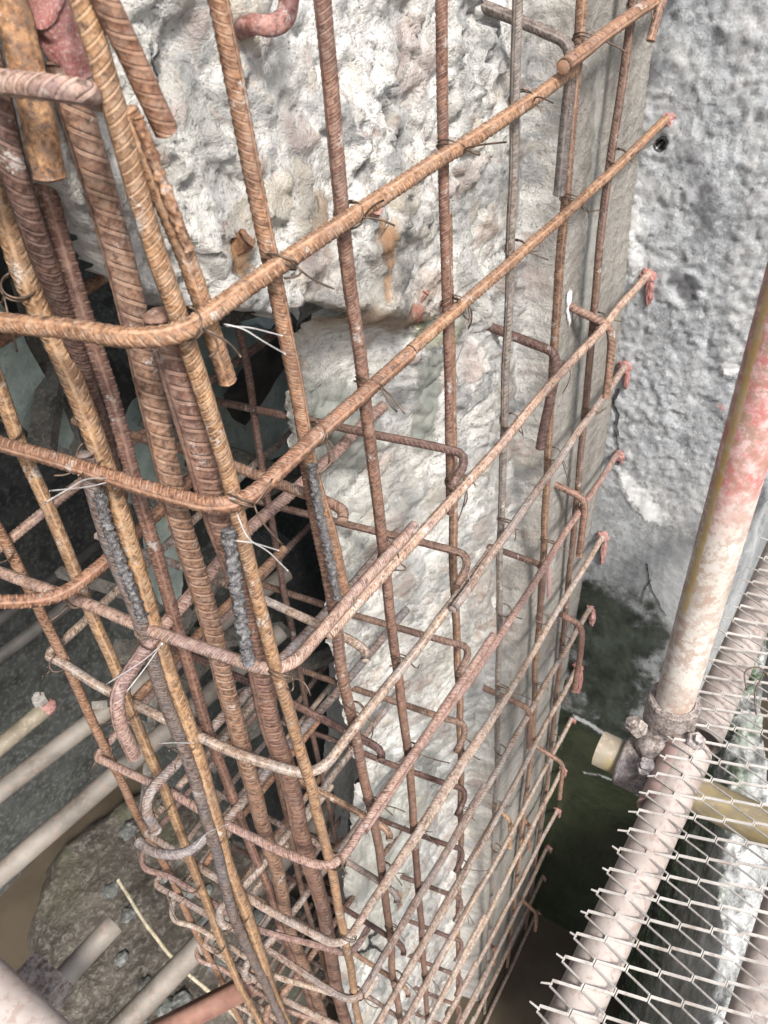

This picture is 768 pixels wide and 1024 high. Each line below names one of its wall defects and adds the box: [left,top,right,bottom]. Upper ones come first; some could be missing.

corrosion [231,243,250,277]
corrosion [378,218,400,299]
spalling [361,307,431,332]
crack [611,388,625,466]